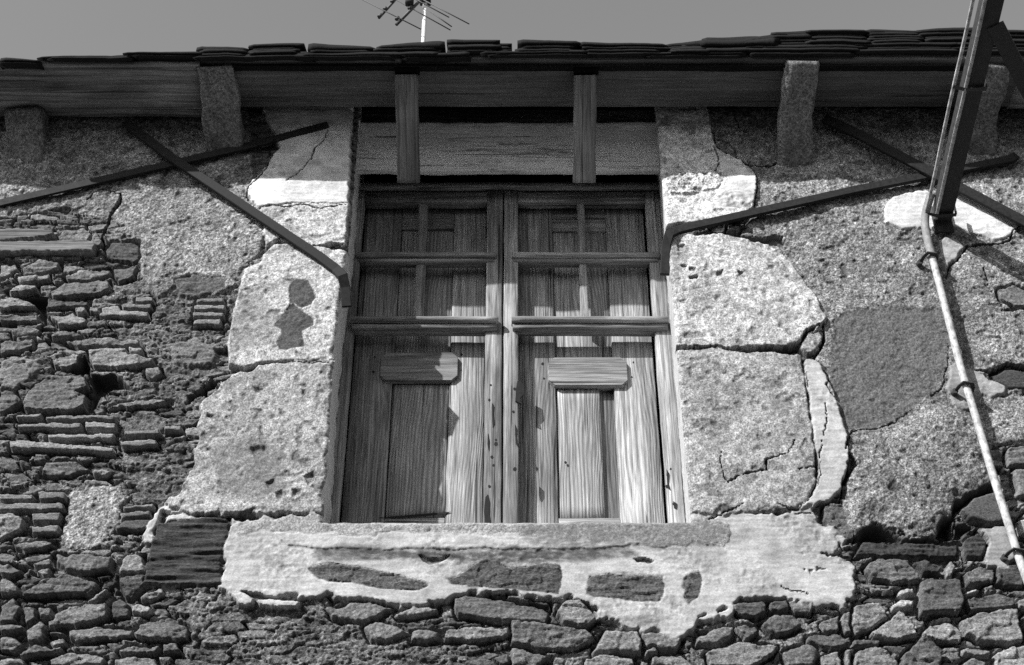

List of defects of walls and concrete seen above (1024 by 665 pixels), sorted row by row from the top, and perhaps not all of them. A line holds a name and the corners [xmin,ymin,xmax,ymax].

crack [246,129,347,209]
peeling [22,294,52,332]
peeling [70,352,135,414]
crack [689,321,950,520]
spalling [250,425,270,460]
spalling [265,469,317,499]
spalling [239,505,256,520]
flaking render [419,554,451,565]
peeling [233,590,310,609]